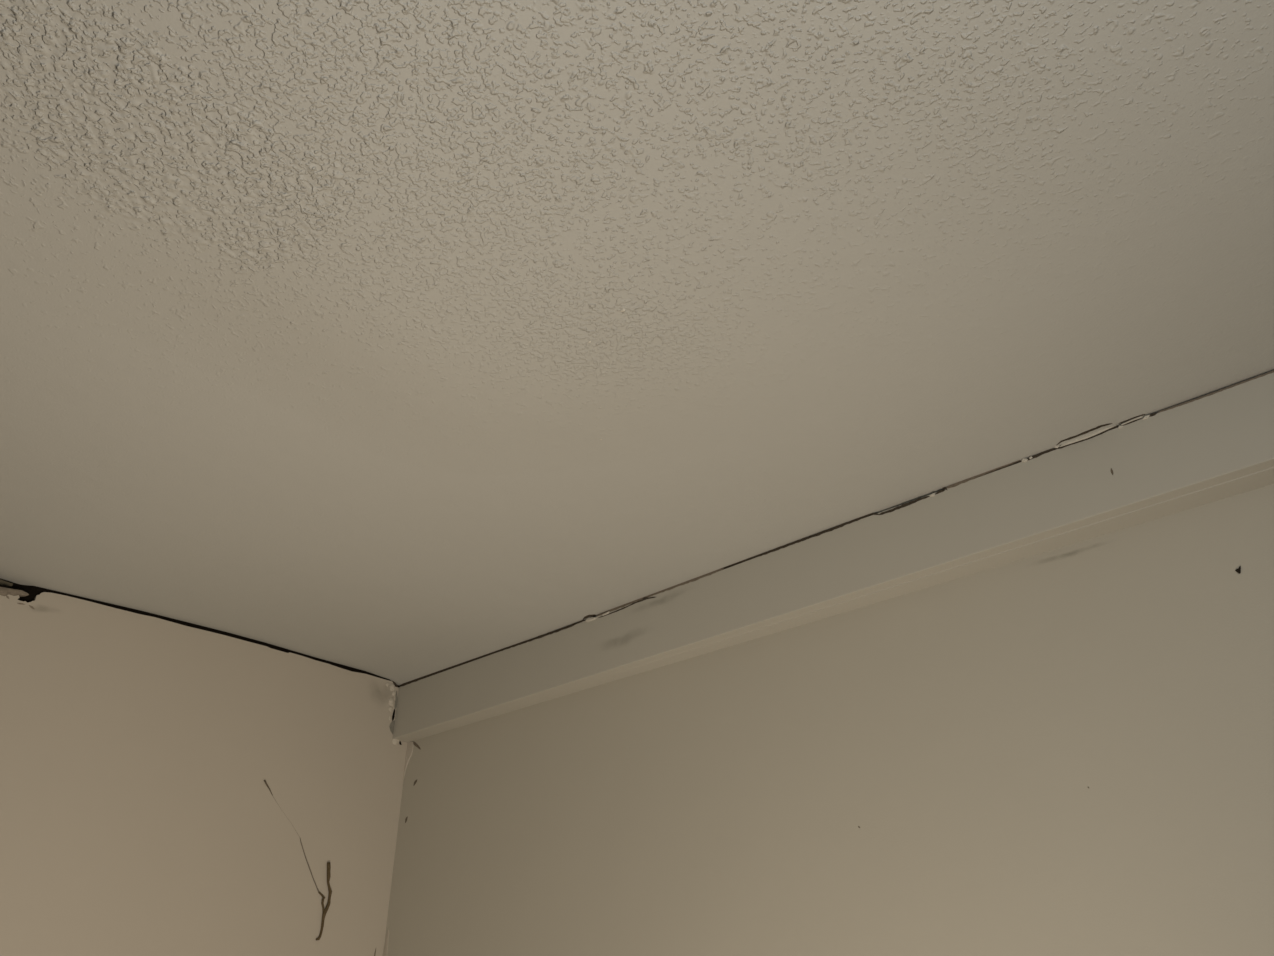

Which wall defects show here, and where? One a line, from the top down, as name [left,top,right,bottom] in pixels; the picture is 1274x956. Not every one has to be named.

crack [386,370,1274,750]